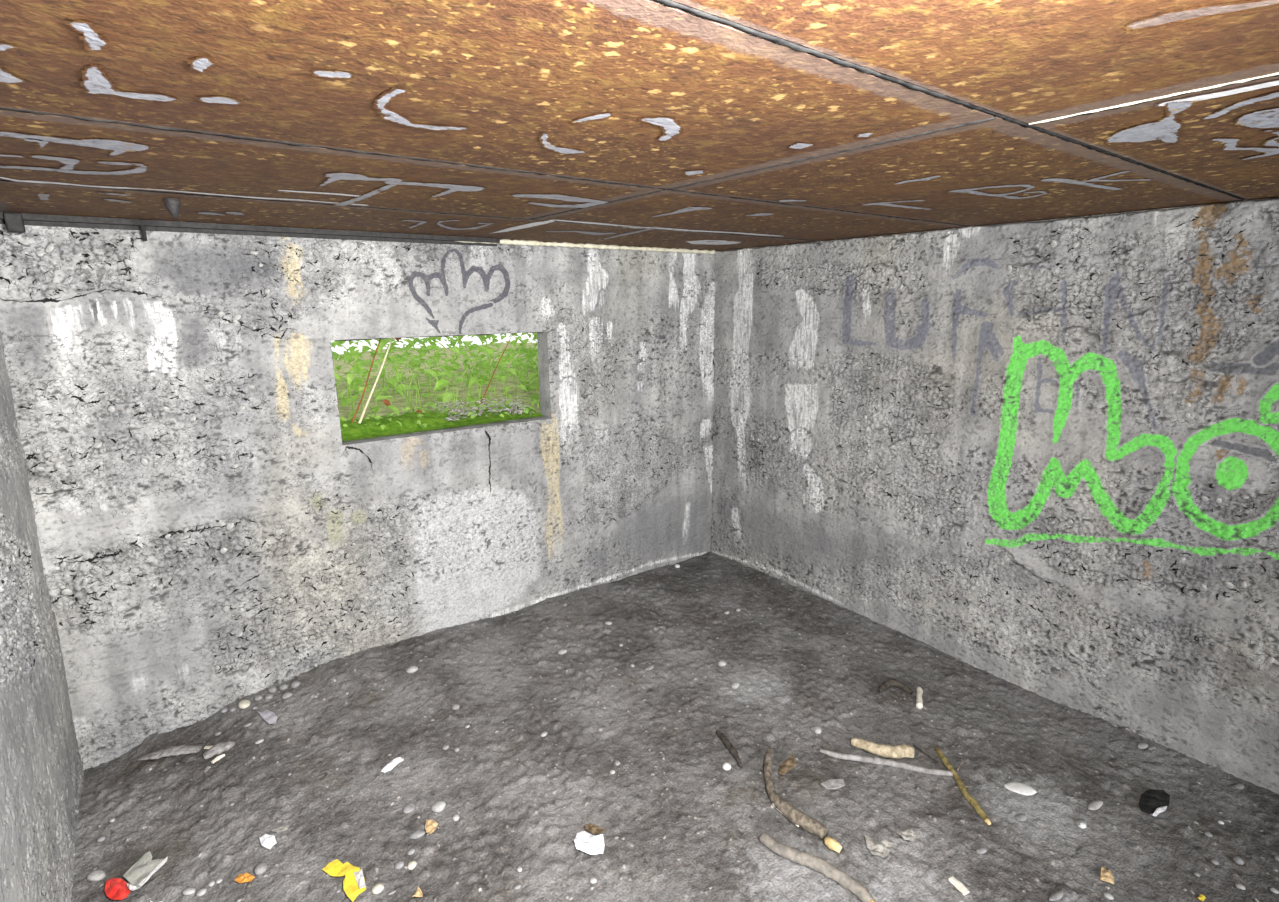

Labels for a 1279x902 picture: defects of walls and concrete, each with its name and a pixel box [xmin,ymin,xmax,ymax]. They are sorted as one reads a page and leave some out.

leakage [938,225,986,290]
corrosion [1175,202,1268,418]
crack [484,431,492,492]
leakage [562,247,1108,617]